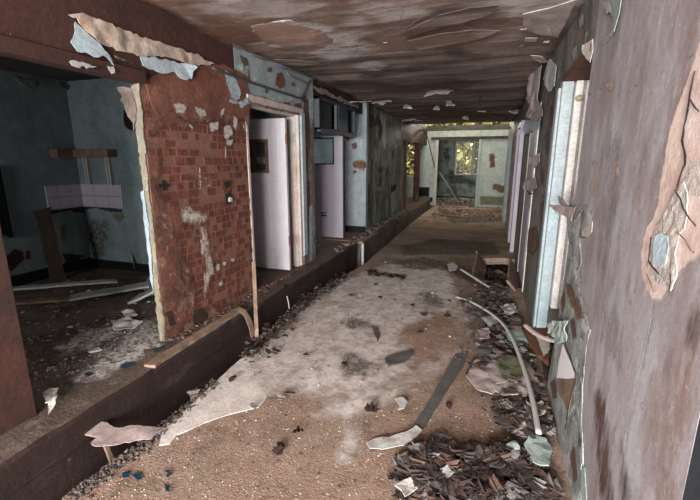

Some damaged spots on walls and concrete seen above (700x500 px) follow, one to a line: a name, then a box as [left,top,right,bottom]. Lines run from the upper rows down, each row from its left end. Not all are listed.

spalling [69,12,396,353]
water stain [369,116,415,158]
peeling [509,36,593,500]
crack [646,262,671,292]
spalling [641,42,700,300]
crack [674,71,699,253]